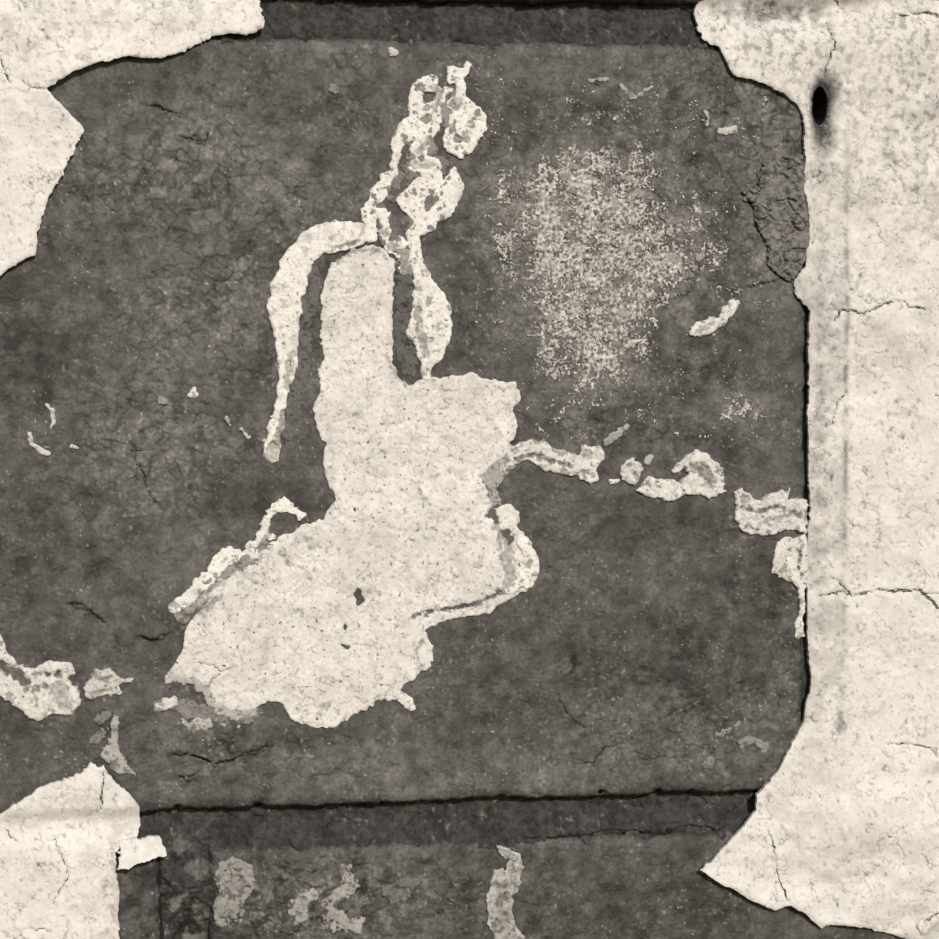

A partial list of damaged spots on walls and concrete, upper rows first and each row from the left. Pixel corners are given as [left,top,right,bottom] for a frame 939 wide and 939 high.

crack [898,0,939,17]
peeling [0,0,265,276]
crack [741,155,814,288]
crack [831,300,931,321]
peeling [153,61,770,741]
peeling [608,0,939,939]
crack [818,577,939,609]
peeling [0,634,134,722]
crack [54,838,69,898]
peeling [0,710,167,939]
peeling [486,845,525,939]
crack [766,828,788,899]